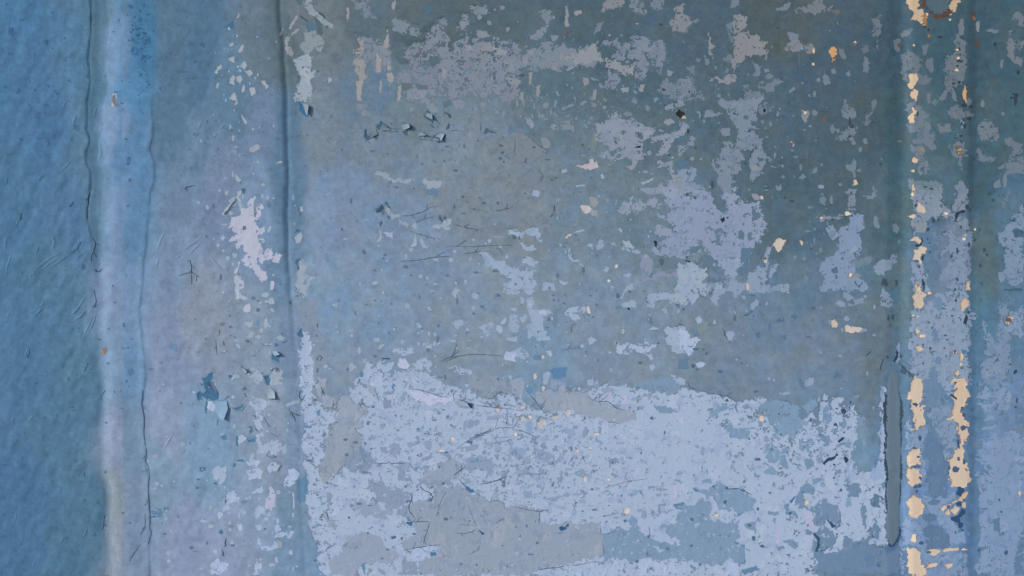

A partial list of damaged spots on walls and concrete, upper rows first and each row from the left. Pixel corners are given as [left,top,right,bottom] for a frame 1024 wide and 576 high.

peeling [906,0,942,38]
peeling [292,0,333,114]
peeling [899,73,919,123]
peeling [212,174,285,349]
peeling [237,157,1024,576]
peeling [211,465,240,519]
peeling [210,544,234,575]